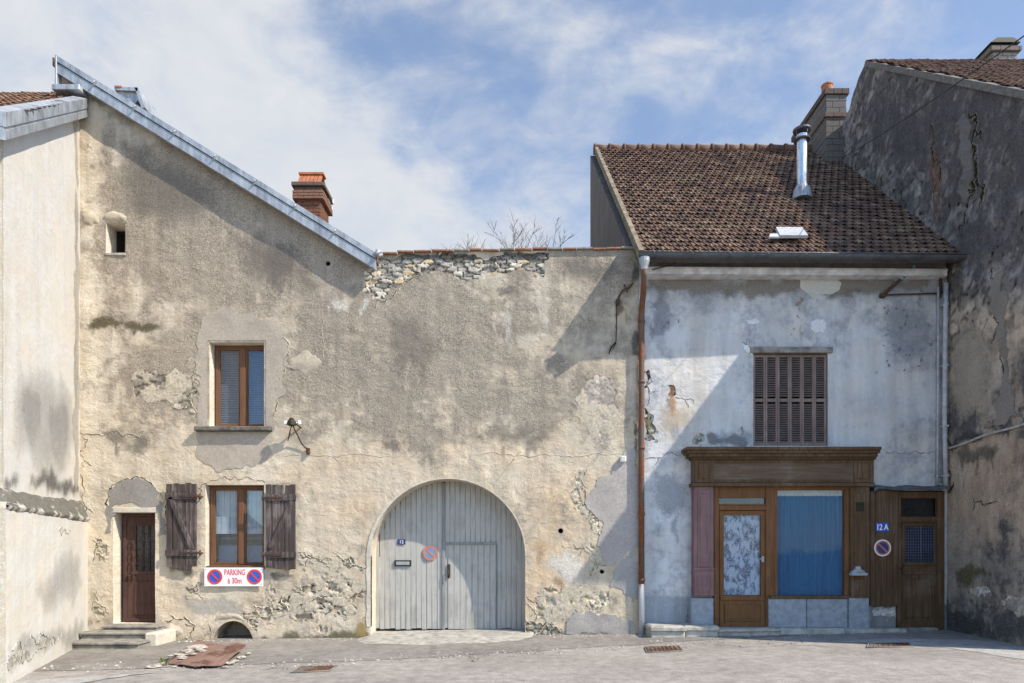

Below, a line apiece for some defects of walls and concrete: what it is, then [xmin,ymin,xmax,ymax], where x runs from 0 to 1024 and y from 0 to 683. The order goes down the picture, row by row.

crack [962,112,987,229]
flaking render [363,251,549,300]
flaking render [131,368,197,413]
spalling [644,408,659,442]
crack [279,453,400,462]
flaking render [571,470,600,533]
flaking render [242,553,371,636]
flaking render [970,586,991,597]